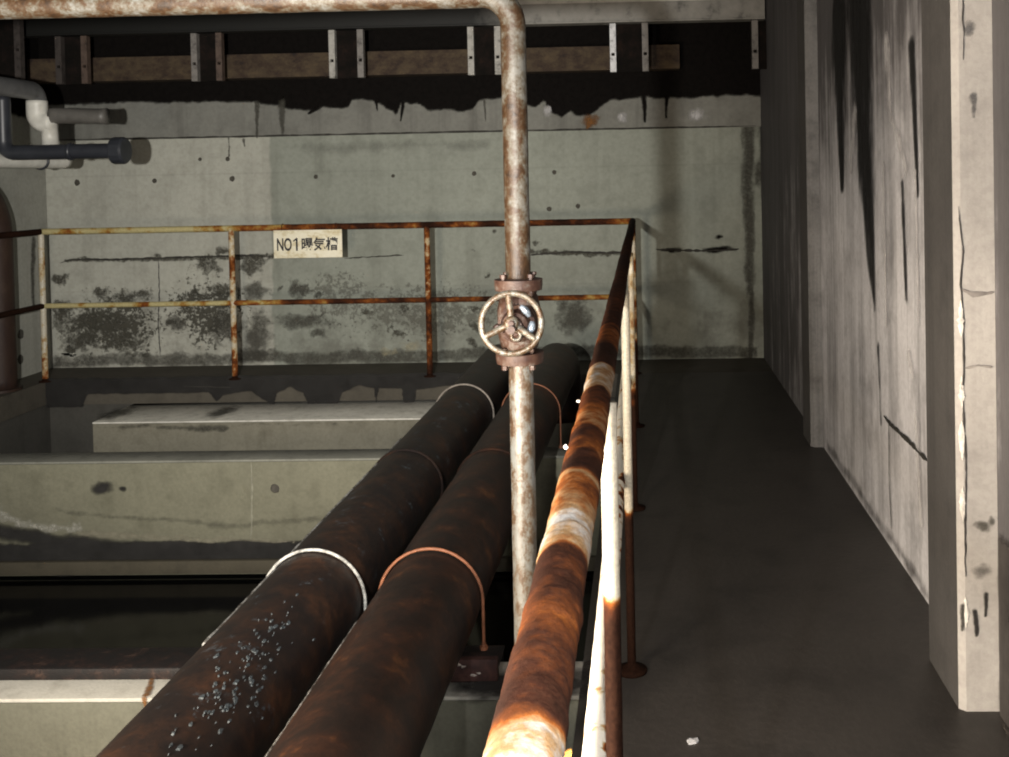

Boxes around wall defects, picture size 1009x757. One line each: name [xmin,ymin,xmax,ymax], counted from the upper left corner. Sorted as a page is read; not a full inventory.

damp [45,248,486,431]
crack [884,416,927,461]
crack [958,206,994,575]
damp [0,512,301,561]